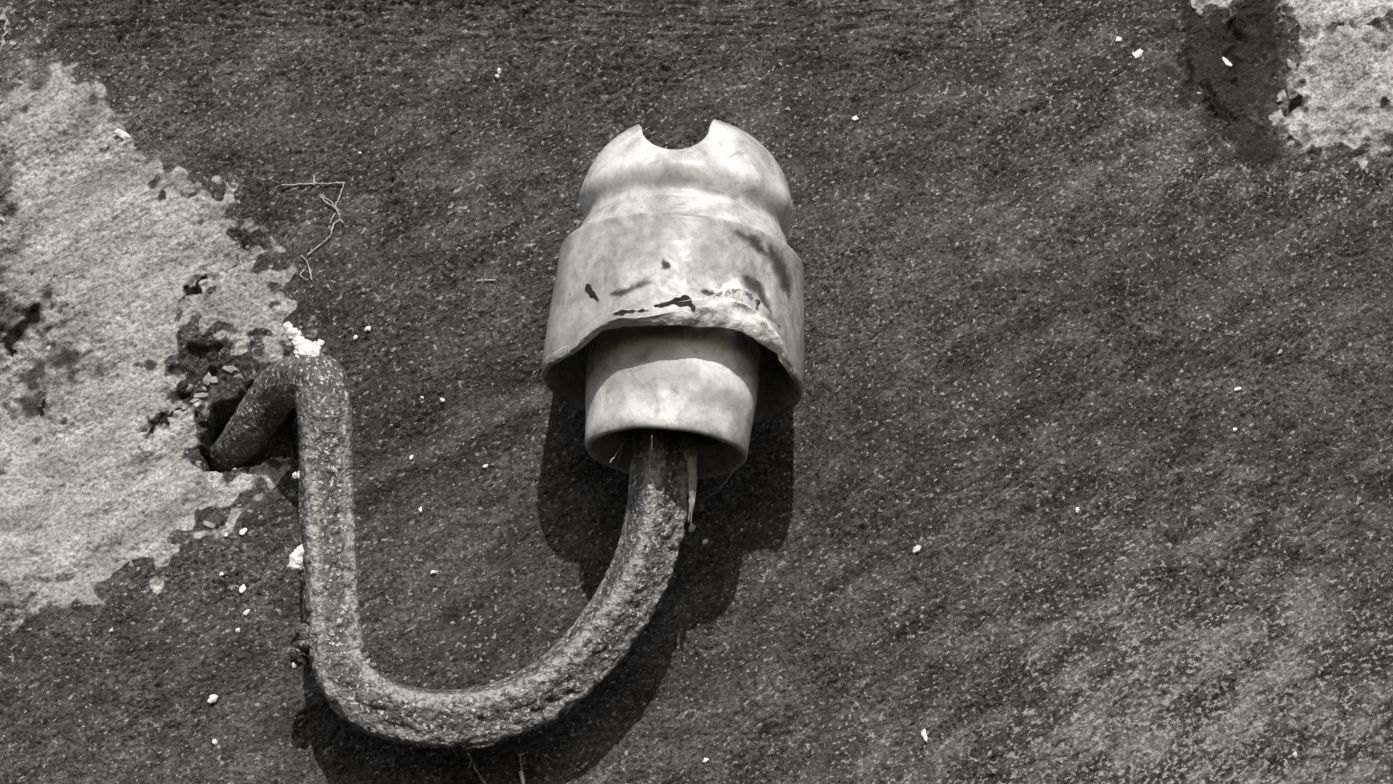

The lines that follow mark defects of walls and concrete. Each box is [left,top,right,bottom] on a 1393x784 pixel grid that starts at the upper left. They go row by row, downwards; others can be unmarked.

spalling [1190,0,1242,17]
spalling [1266,0,1393,169]
spalling [0,59,318,631]